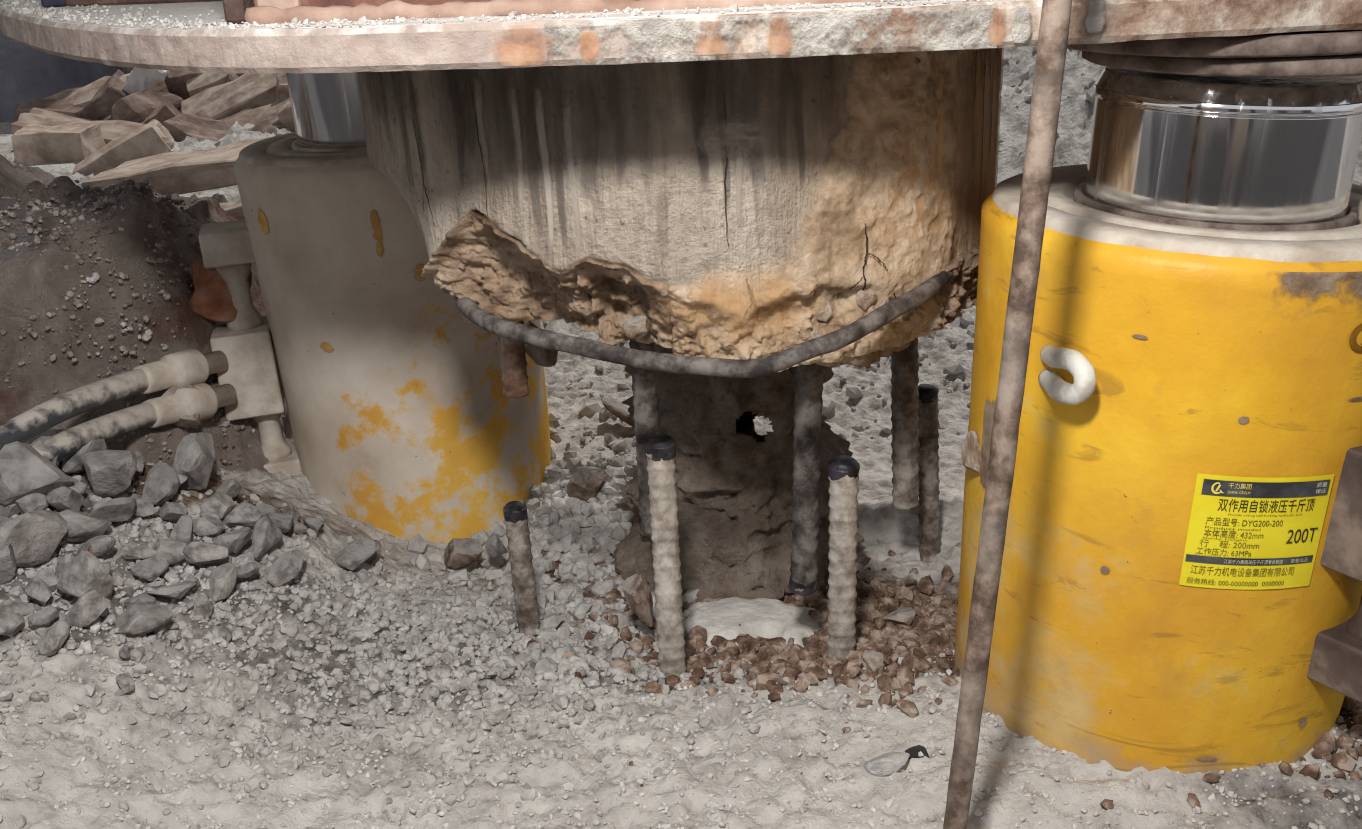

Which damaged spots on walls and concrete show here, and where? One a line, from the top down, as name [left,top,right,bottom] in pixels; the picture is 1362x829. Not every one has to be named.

corrosion [498,30,543,66]
corrosion [580,31,598,60]
corrosion [769,22,790,54]
damp [369,71,423,181]
damp [441,66,624,248]
damp [685,58,765,219]
damp [779,58,804,176]
spalling [413,50,980,677]